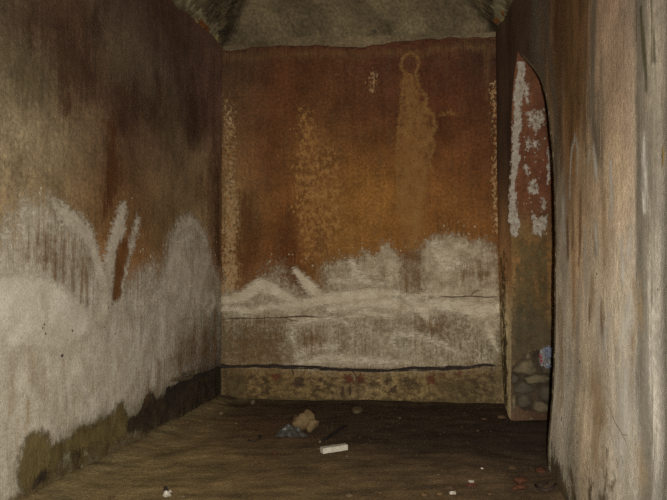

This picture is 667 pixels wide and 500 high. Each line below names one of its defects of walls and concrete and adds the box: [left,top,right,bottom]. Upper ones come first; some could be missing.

leakage [113,239,129,300]
crack [165,363,496,405]
leakage [383,238,551,404]
peeling [508,54,557,466]